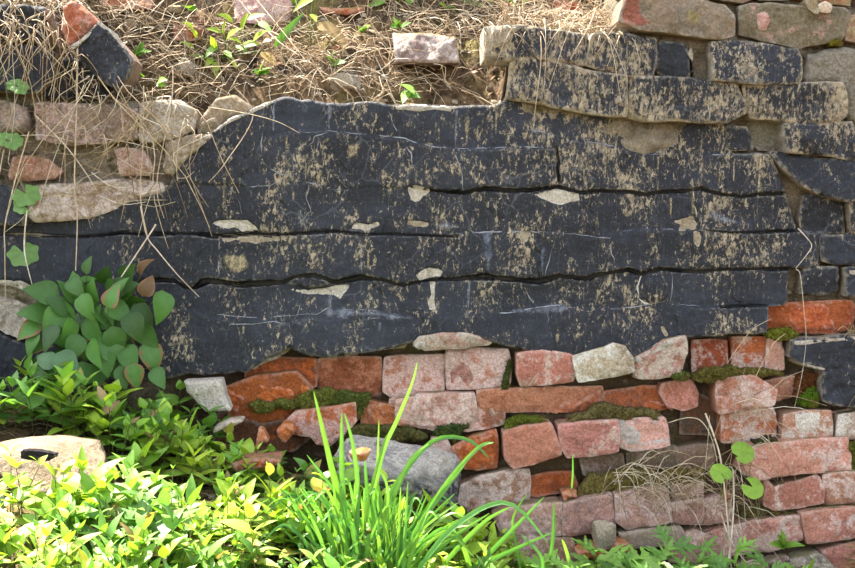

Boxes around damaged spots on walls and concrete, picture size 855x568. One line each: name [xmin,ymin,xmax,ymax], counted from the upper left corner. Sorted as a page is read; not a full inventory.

peeling [534,189,580,205]
crack [11,100,791,345]
peeling [417,268,442,310]